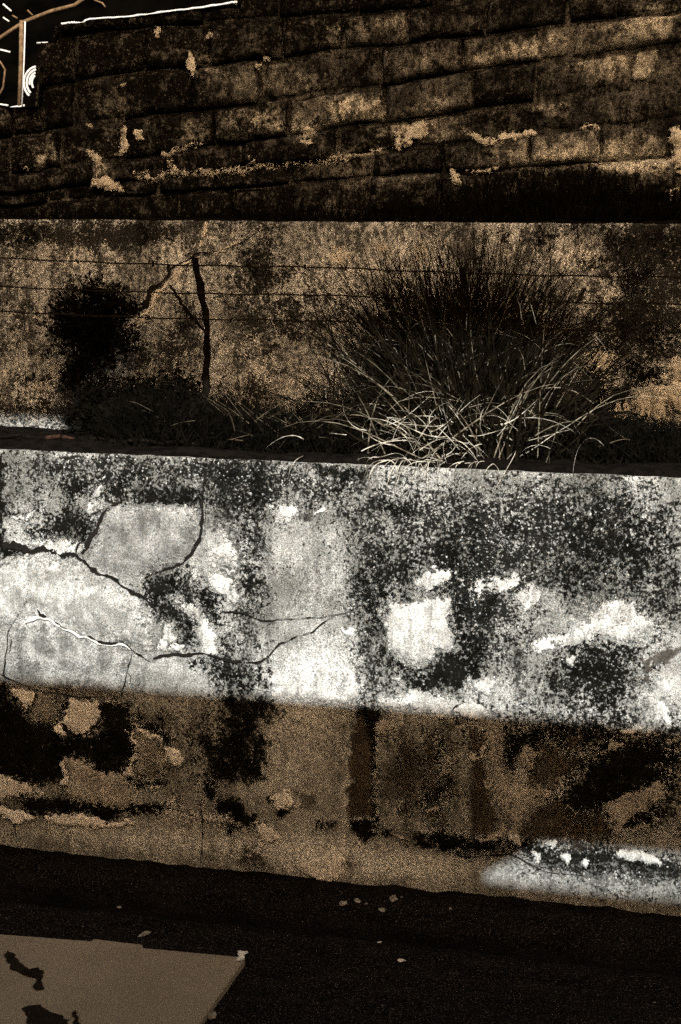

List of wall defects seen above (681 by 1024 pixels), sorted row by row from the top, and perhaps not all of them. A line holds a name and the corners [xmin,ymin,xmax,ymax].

crack [127,227,272,325]
water stain [0,453,286,836]
crack [0,471,354,714]
water stain [315,476,681,882]
water stain [240,848,263,865]